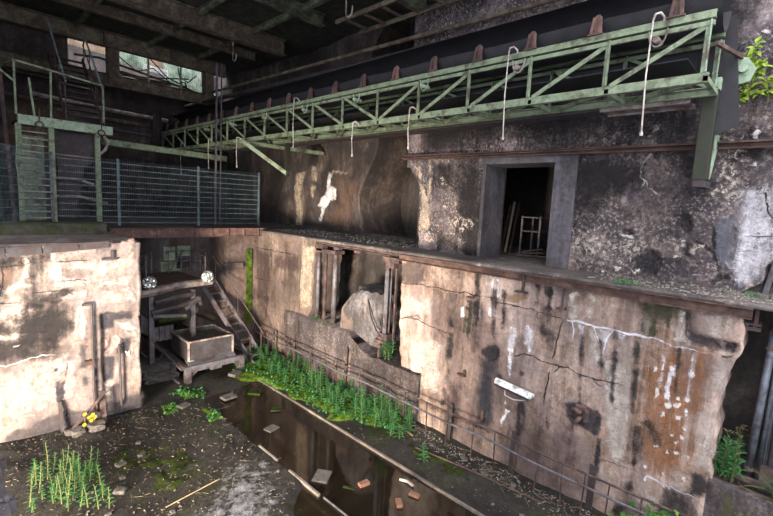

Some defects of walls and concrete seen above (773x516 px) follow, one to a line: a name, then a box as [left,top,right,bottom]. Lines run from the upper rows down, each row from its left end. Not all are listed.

leakage [318,174,336,221]
leakage [39,289,71,304]
leakage [0,312,143,442]
leakage [402,263,425,283]
crack [400,315,452,338]
leakage [406,274,516,432]
leakage [478,360,525,435]
leakage [525,284,555,352]
leakage [569,291,659,470]
rust [638,352,704,477]